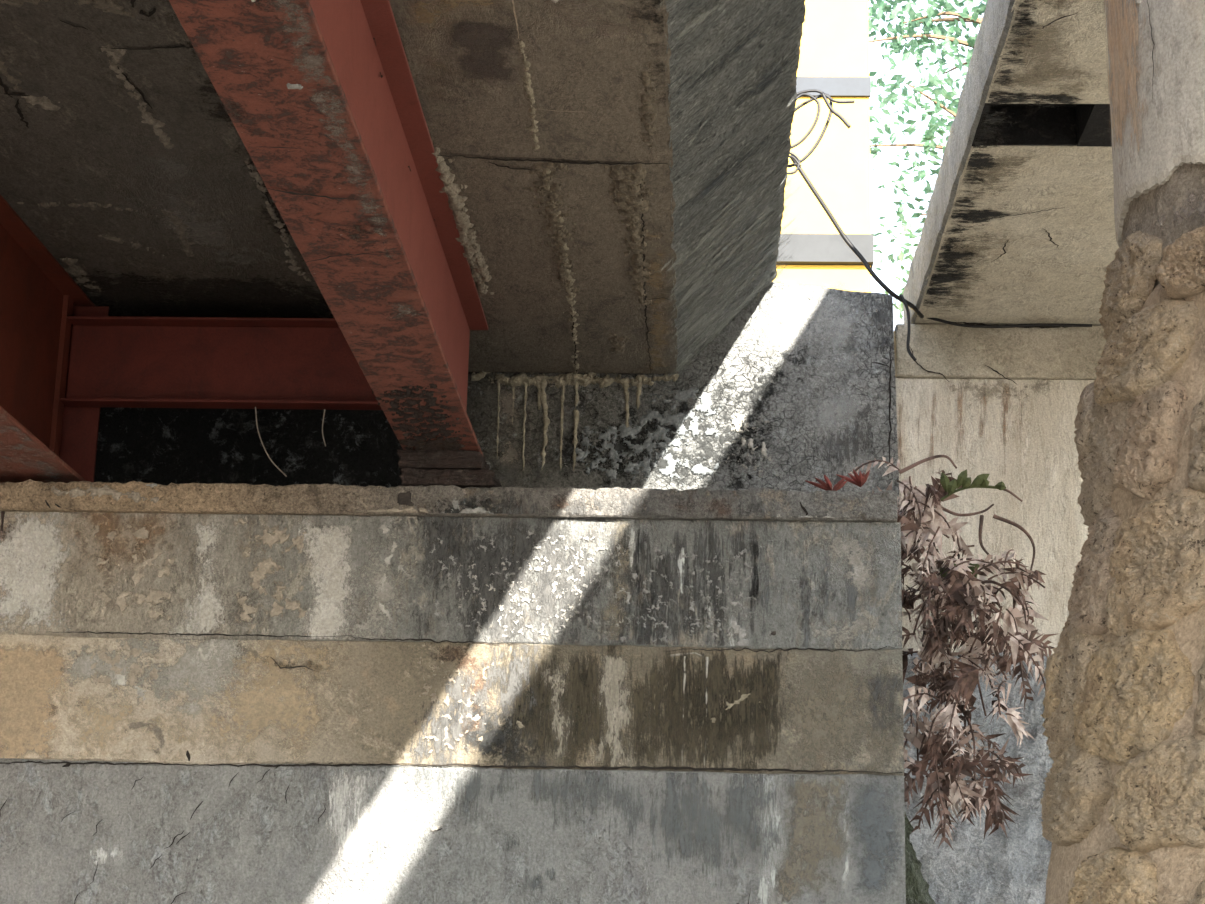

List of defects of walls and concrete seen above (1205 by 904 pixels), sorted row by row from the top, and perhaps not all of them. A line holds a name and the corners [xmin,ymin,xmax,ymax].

crack [0,61,60,128]
crack [60,20,193,109]
crack [130,0,156,17]
crack [437,0,667,171]
water stain [923,0,1081,306]
water stain [471,135,792,471]
rust [372,384,466,451]
peeling [555,369,779,489]
water stain [749,339,816,410]
water stain [813,404,873,485]
water stain [0,646,66,758]
water stain [73,491,902,901]